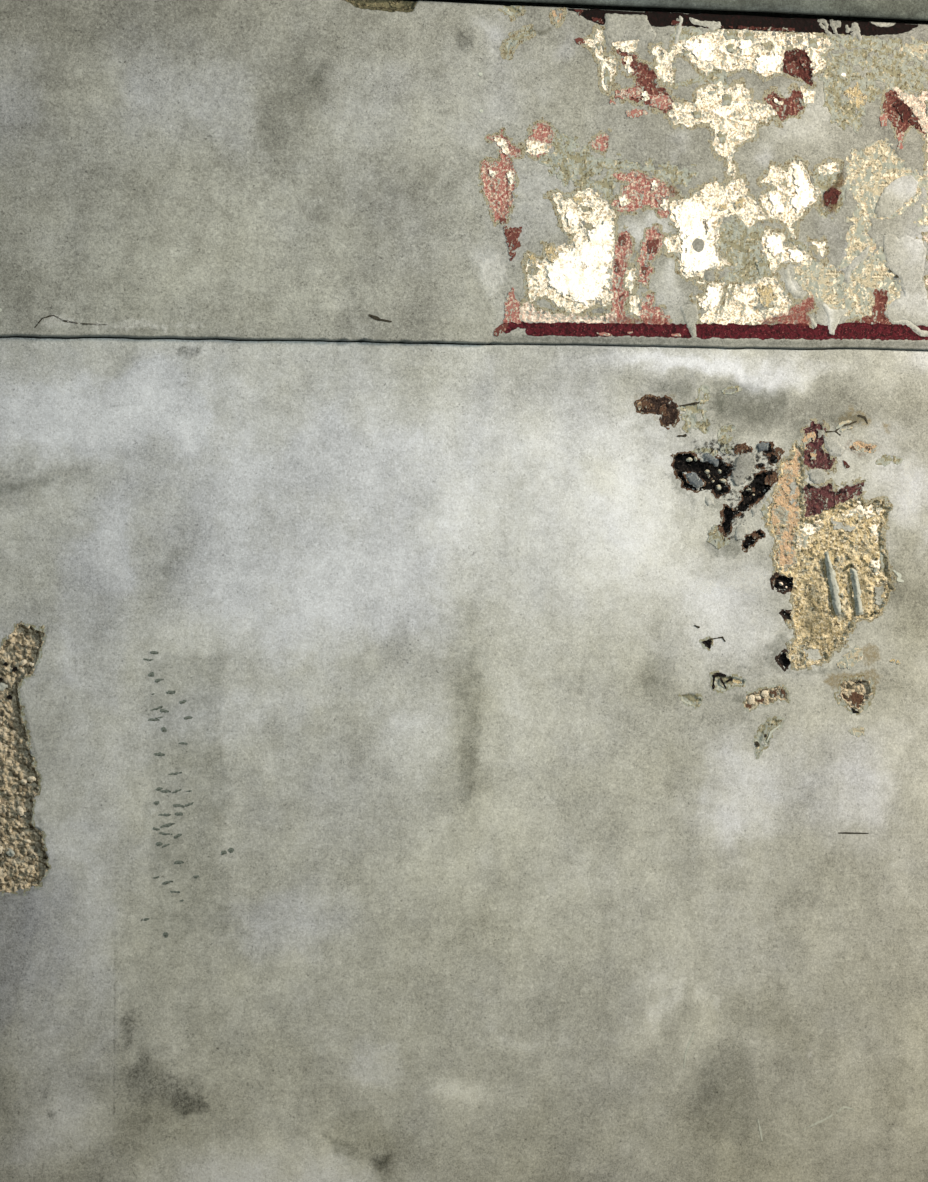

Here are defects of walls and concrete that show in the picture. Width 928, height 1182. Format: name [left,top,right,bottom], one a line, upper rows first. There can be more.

flaking render [498,5,536,61]
flaking render [549,7,567,28]
flaking render [575,14,894,338]
flaking render [875,89,928,218]
flaking render [503,188,641,324]
flaking render [883,232,928,337]
flaking render [670,385,904,759]
spalling [0,621,51,896]